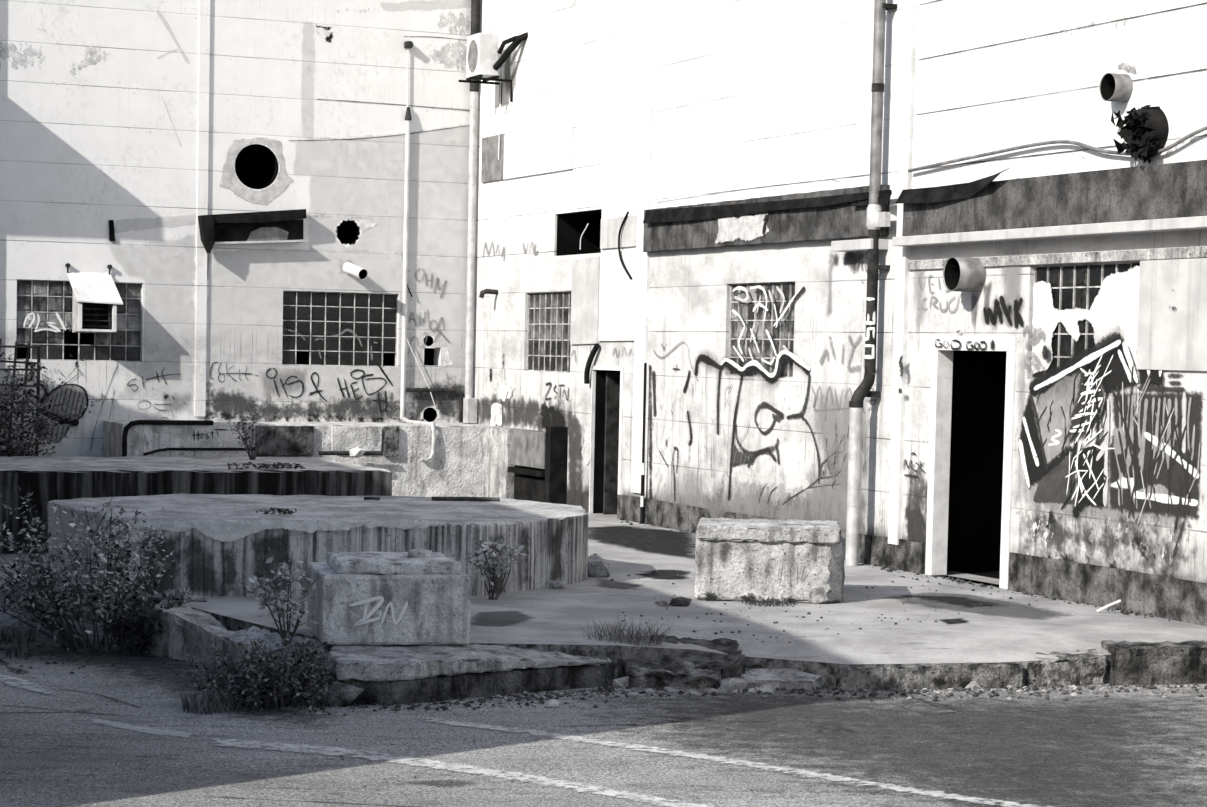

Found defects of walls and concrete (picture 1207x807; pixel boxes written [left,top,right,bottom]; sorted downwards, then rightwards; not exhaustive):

peeling [0,27,47,69]
peeling [70,46,107,78]
spalling [715,213,769,244]
peeling [1031,266,1140,374]
leakage [204,351,582,506]
leakage [1024,485,1190,578]